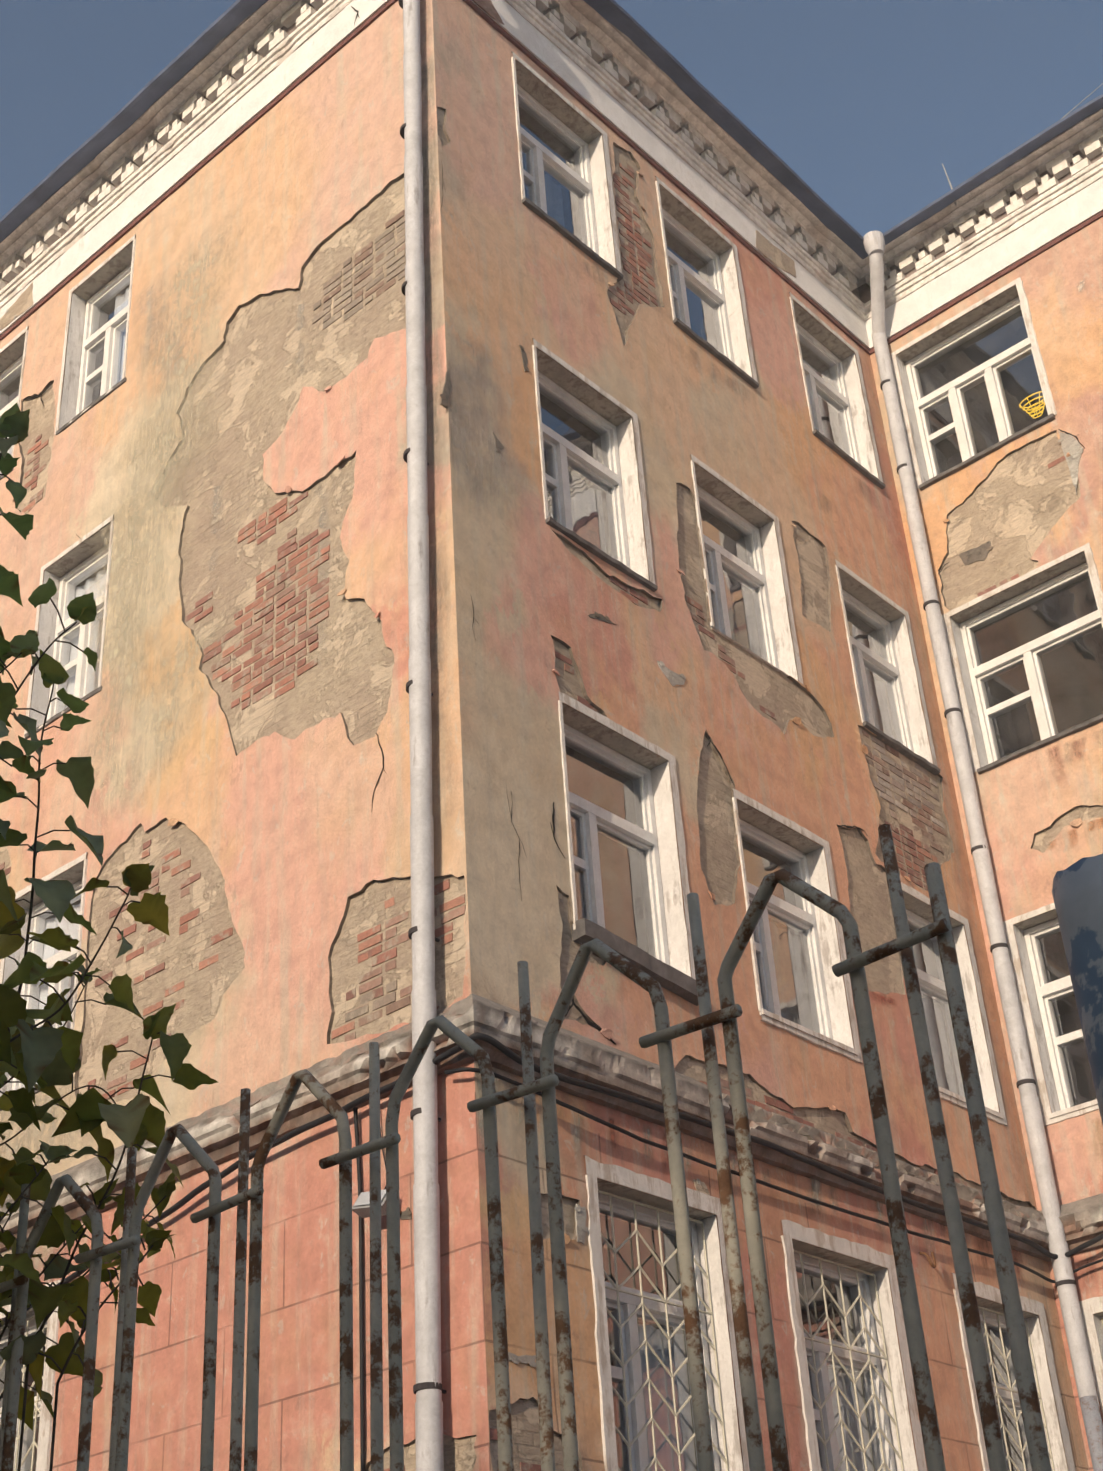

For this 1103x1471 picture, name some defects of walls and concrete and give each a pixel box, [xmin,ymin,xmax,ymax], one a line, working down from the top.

peeling [607,142,664,345]
peeling [12,380,56,514]
peeling [150,169,406,756]
peeling [676,483,834,738]
peeling [938,430,1084,618]
peeling [74,818,245,1104]
peeling [327,876,412,1044]
peeling [434,874,466,1011]
crack [565,998,616,1045]
peeling [697,731,741,906]
peeling [674,1055,877,1152]
peeling [837,725,954,995]